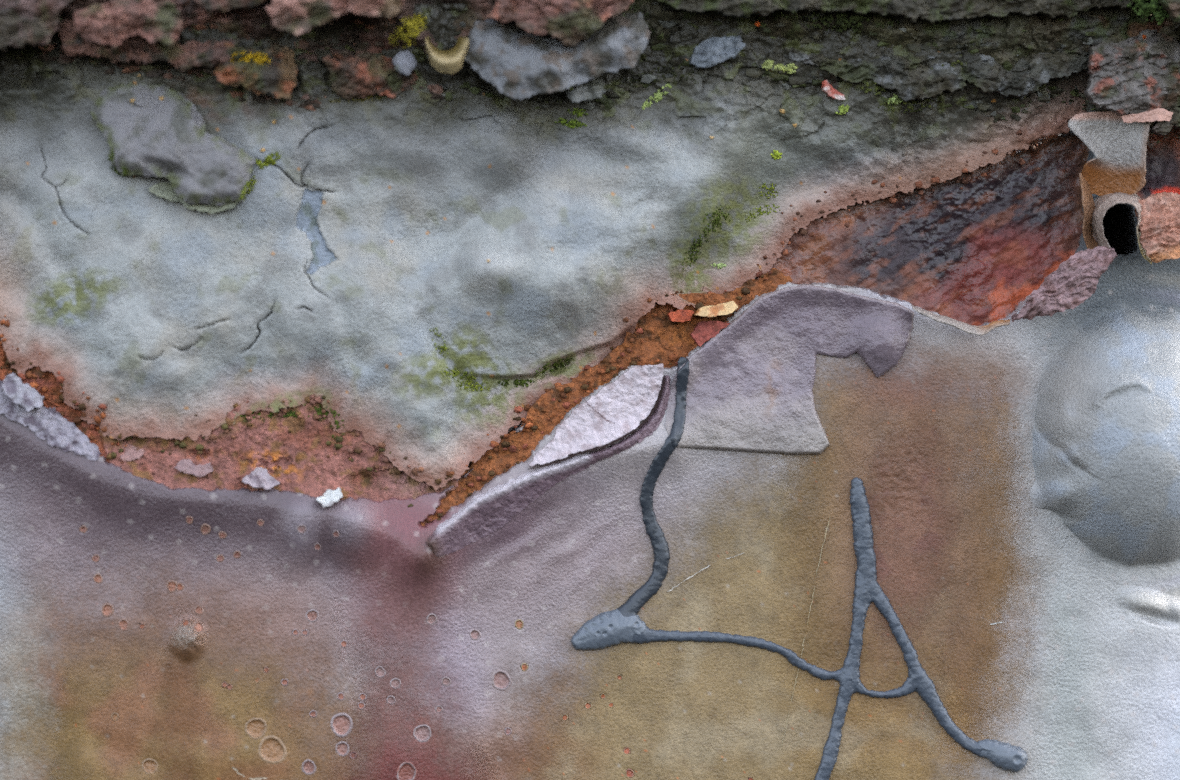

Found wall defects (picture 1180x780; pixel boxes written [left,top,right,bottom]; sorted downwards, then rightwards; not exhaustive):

crack [41,148,87,233]
crack [262,126,335,193]
peeling [0,0,1180,557]
crack [139,319,229,360]
corrosion [0,128,1090,526]